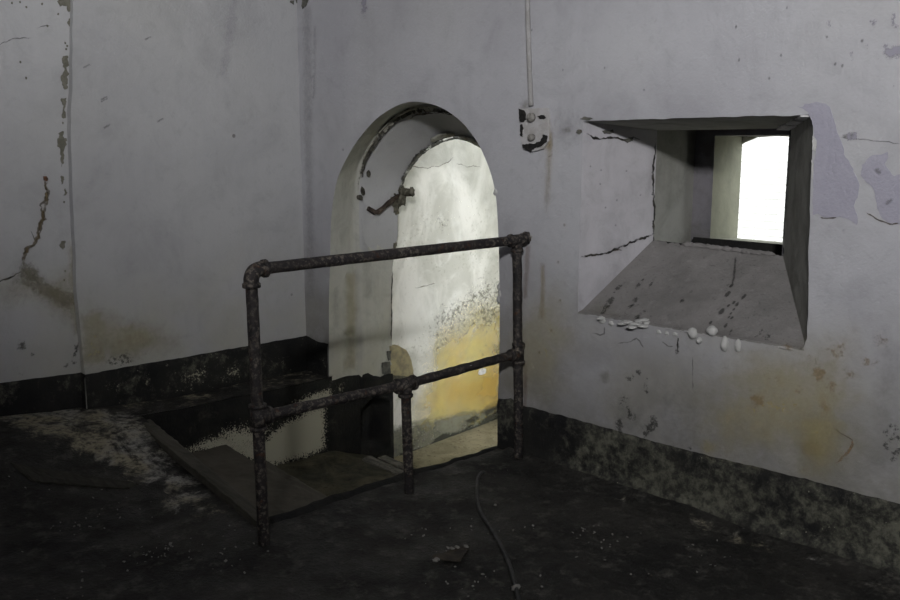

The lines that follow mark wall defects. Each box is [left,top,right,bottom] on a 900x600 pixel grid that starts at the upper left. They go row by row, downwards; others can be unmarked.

peeling [57,0,70,27]
crack [0,176,50,282]
peeling [57,42,69,203]
flaking render [390,132,480,215]
crack [576,117,656,257]
peeling [777,102,900,225]
damp [437,286,500,349]
damp [413,406,497,451]